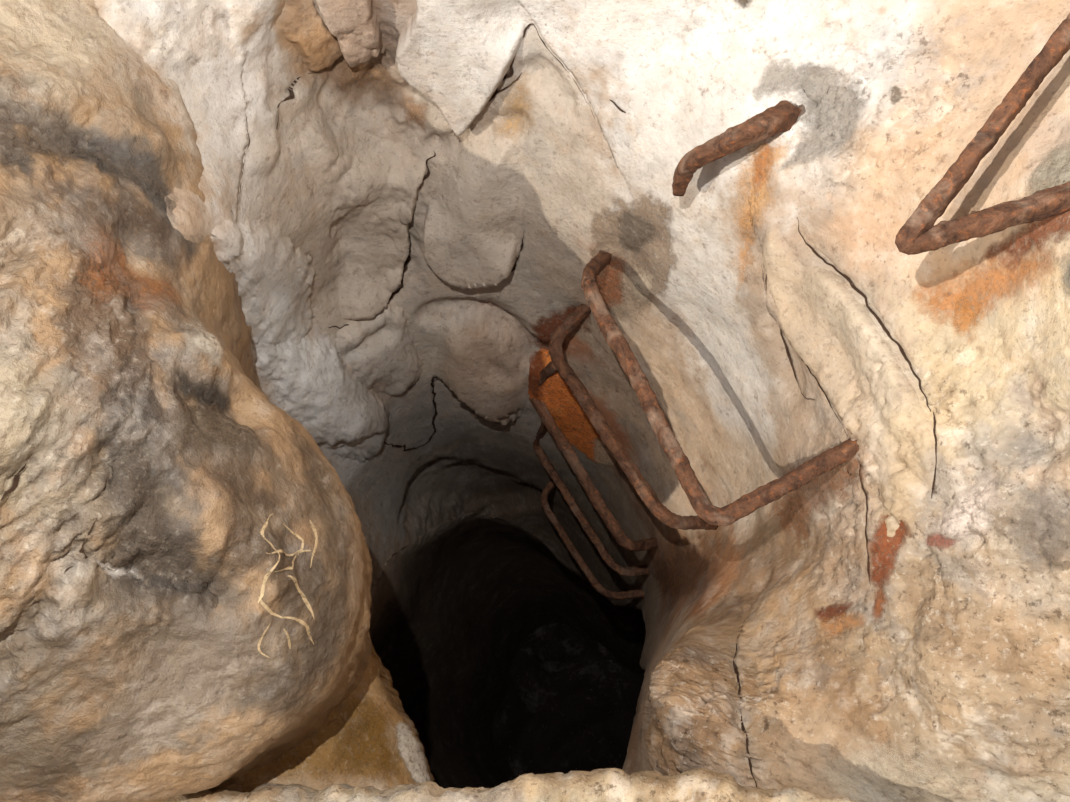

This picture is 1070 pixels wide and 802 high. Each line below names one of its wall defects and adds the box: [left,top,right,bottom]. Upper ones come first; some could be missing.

crack [488,22,626,116]
water stain [0,119,177,264]
crack [389,235,411,301]
crack [419,152,436,187]
crack [511,232,524,272]
rust [740,145,784,264]
rust [919,211,1070,330]
rust [528,305,615,465]
crack [797,218,937,498]
rust [816,604,858,633]
rust [870,515,907,617]
crack [733,617,757,787]